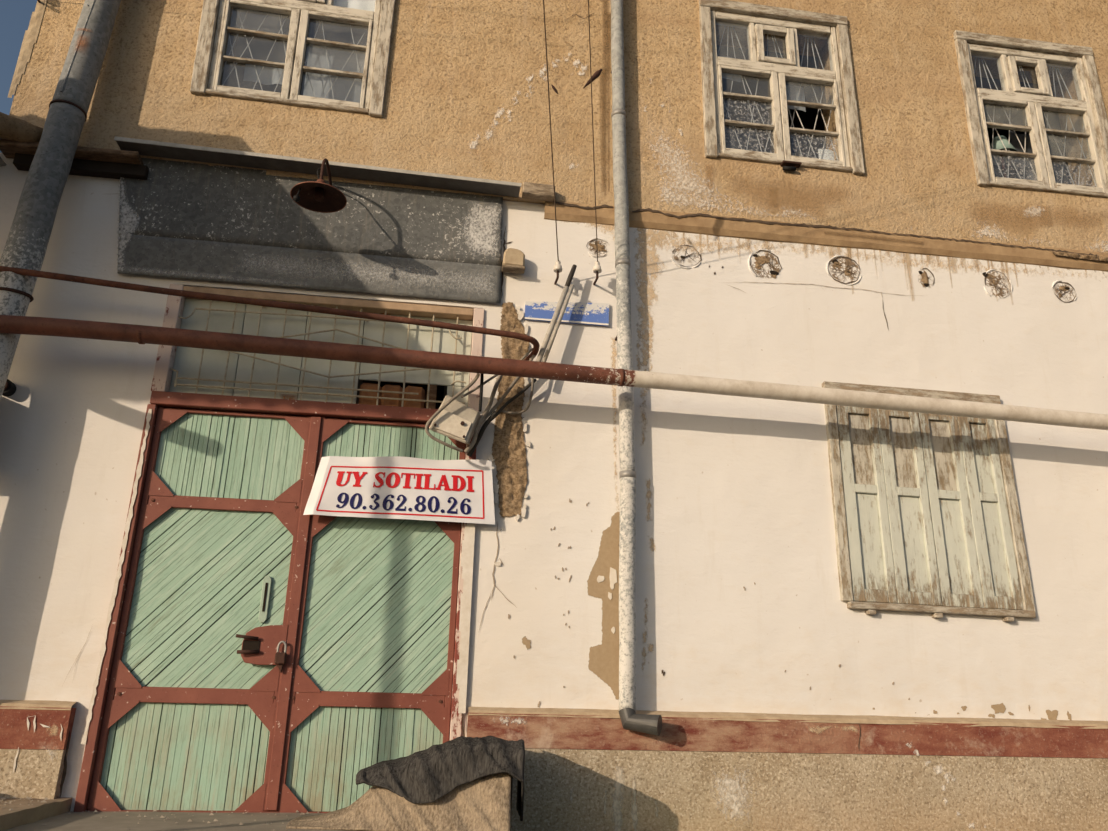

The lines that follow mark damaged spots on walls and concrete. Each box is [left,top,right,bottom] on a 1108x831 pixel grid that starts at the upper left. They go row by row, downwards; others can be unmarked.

flaking render [8,0,47,98]
water stain [653,130,757,213]
flaking render [500,302,530,360]
flaking render [488,375,531,521]
peeling [587,512,620,700]
peeling [988,703,1014,718]
peeling [1041,710,1072,720]